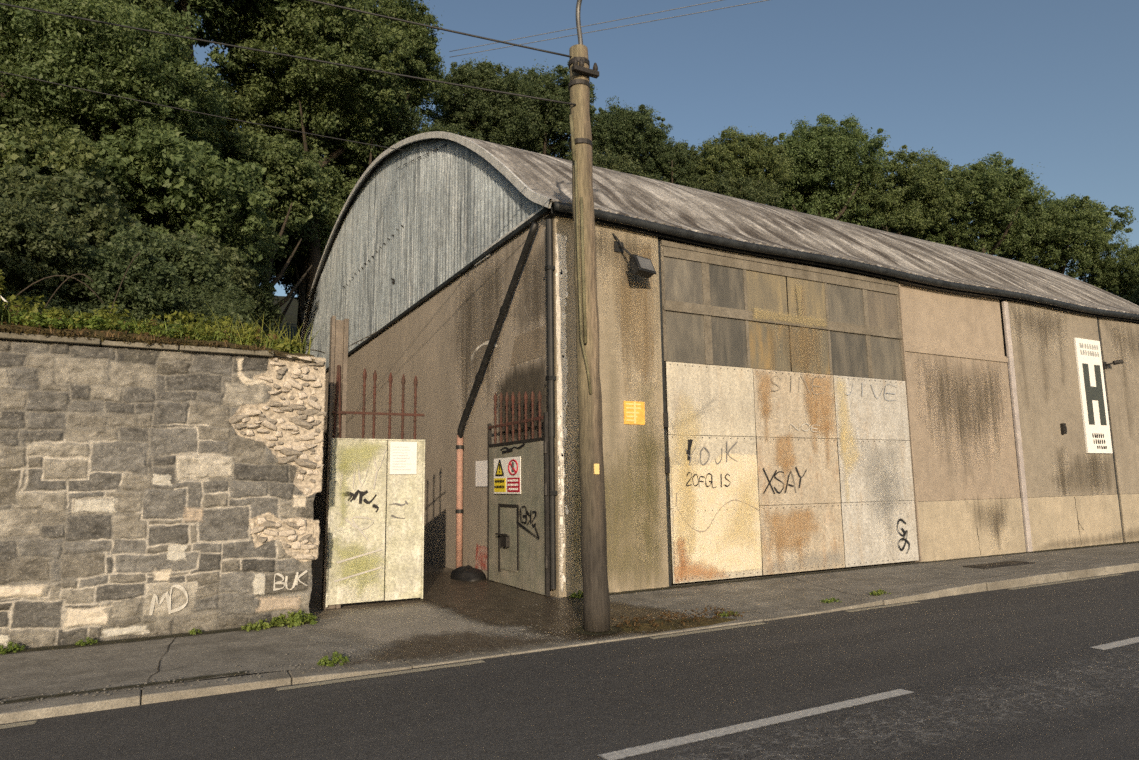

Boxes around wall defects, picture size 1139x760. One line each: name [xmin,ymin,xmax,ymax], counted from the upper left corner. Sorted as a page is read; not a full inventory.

spalling [225,355,327,497]
leakage [499,364,547,442]
corrosion [806,376,832,442]
spalling [249,512,320,562]
corrosion [675,541,716,581]
corrosion [770,511,814,553]